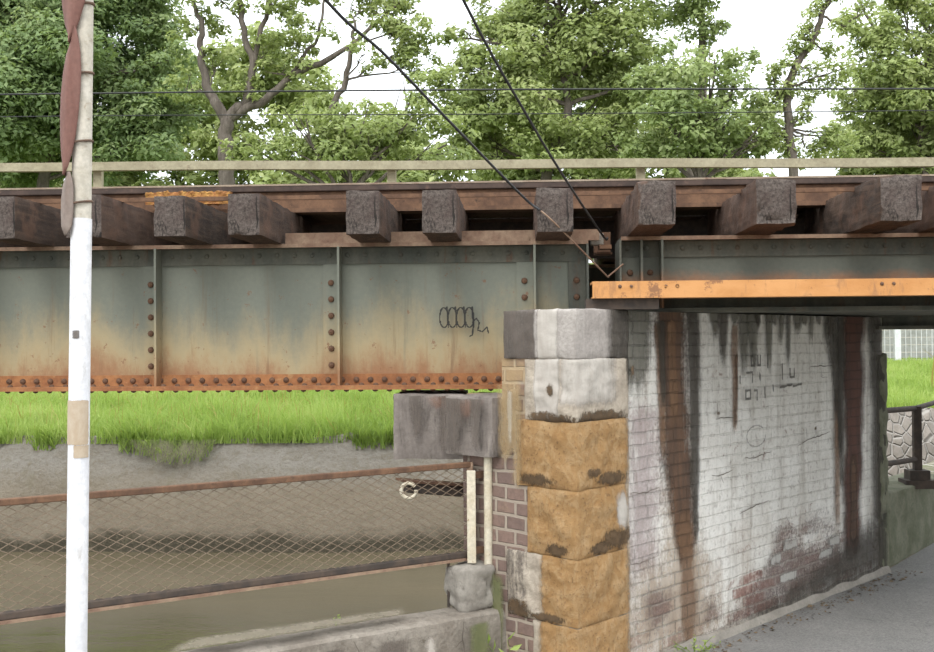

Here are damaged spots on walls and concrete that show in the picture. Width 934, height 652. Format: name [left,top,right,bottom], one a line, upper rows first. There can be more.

water stain [657,321,666,402]
water stain [687,313,701,537]
water stain [710,313,845,484]
peeling [729,518,844,628]
water stain [758,317,887,616]
corrosion [835,317,866,549]